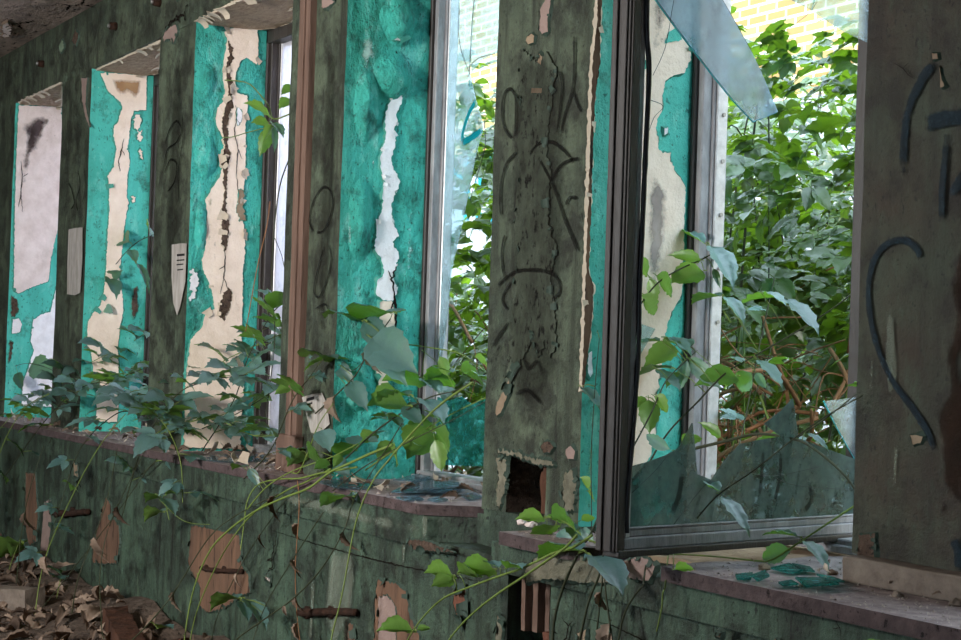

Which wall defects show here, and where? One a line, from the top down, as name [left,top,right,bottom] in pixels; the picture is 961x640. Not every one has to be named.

peeling [932,52,950,90]
damp [25,119,47,167]
crack [233,105,241,192]
peeling [7,82,63,408]
peeling [81,23,180,424]
peeling [181,0,293,451]
peeling [372,94,403,328]
peeling [633,0,693,466]
peeling [495,439,580,515]
peeling [187,523,252,614]
peeling [373,577,422,640]